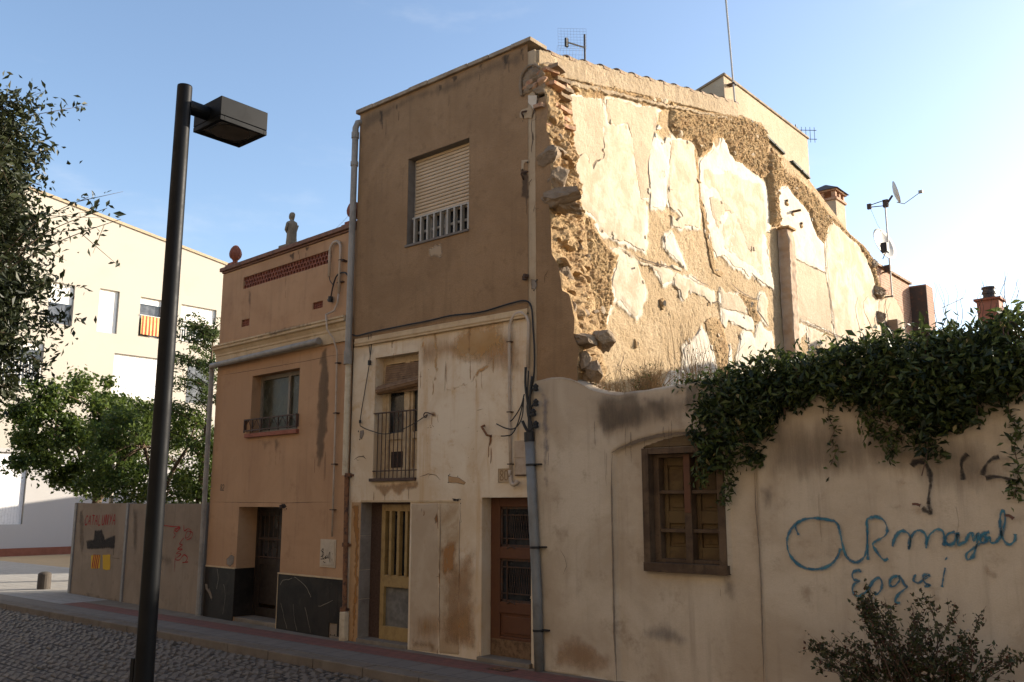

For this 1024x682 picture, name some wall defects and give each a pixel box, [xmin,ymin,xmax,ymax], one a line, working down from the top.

spalling [519,62,913,391]
water stain [314,350,328,472]
water stain [439,544,469,638]